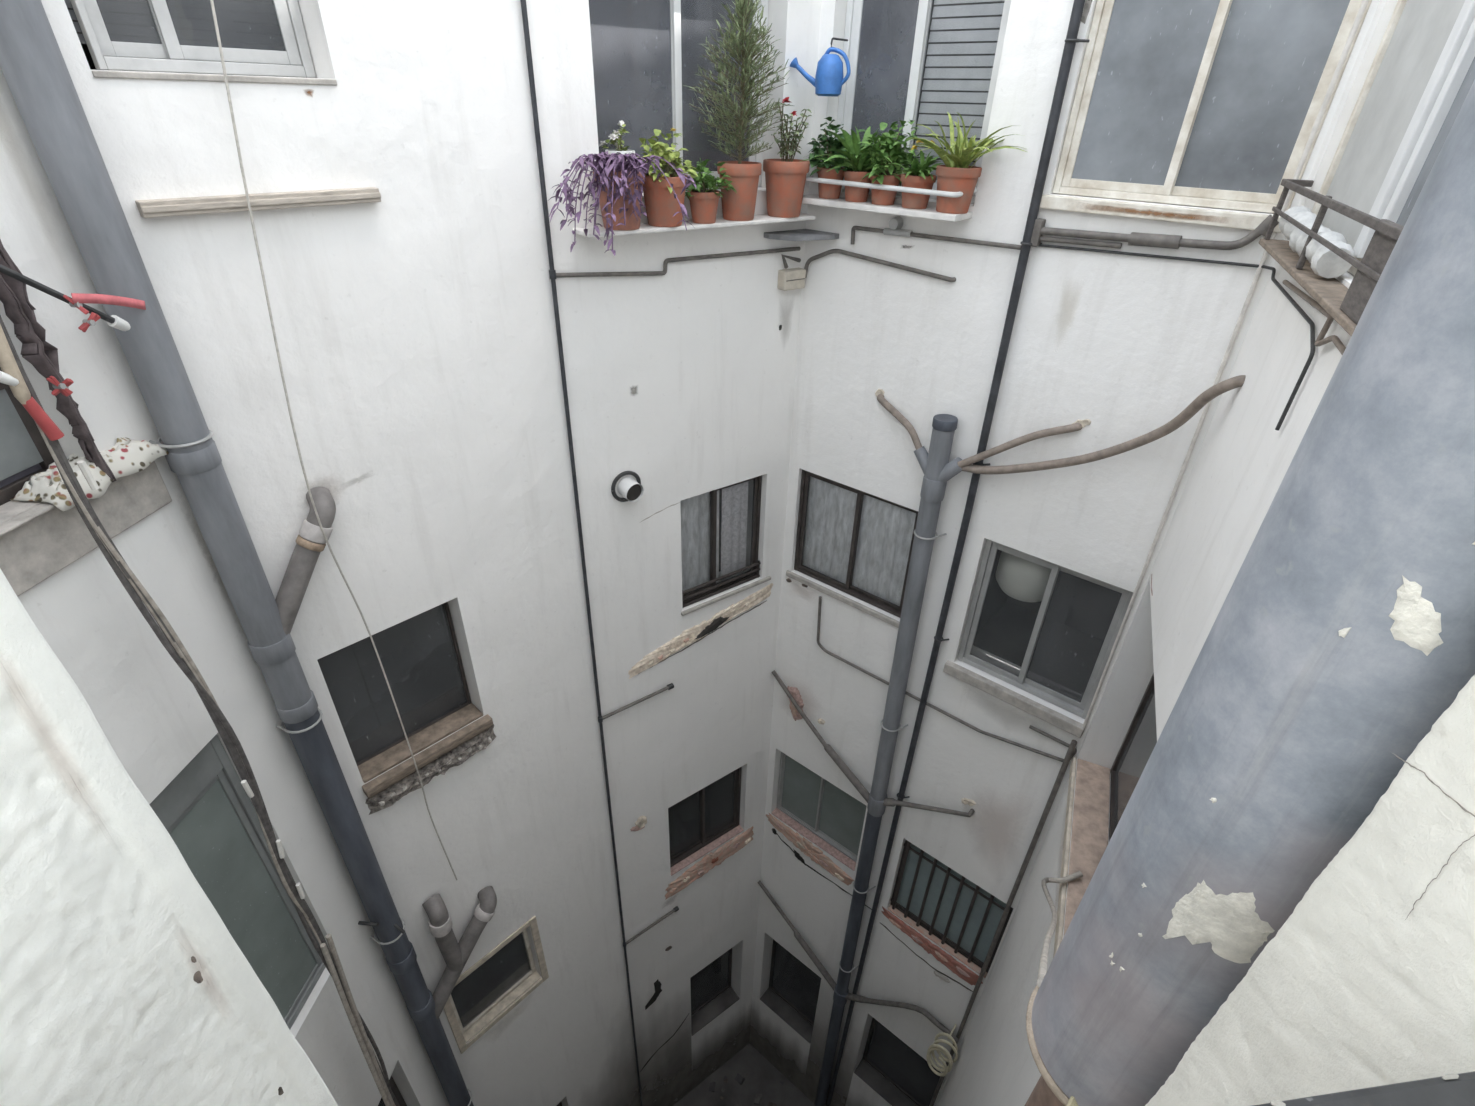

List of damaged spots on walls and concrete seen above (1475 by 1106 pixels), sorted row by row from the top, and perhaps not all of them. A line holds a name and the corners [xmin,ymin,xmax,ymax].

crack [1393,753,1475,921]